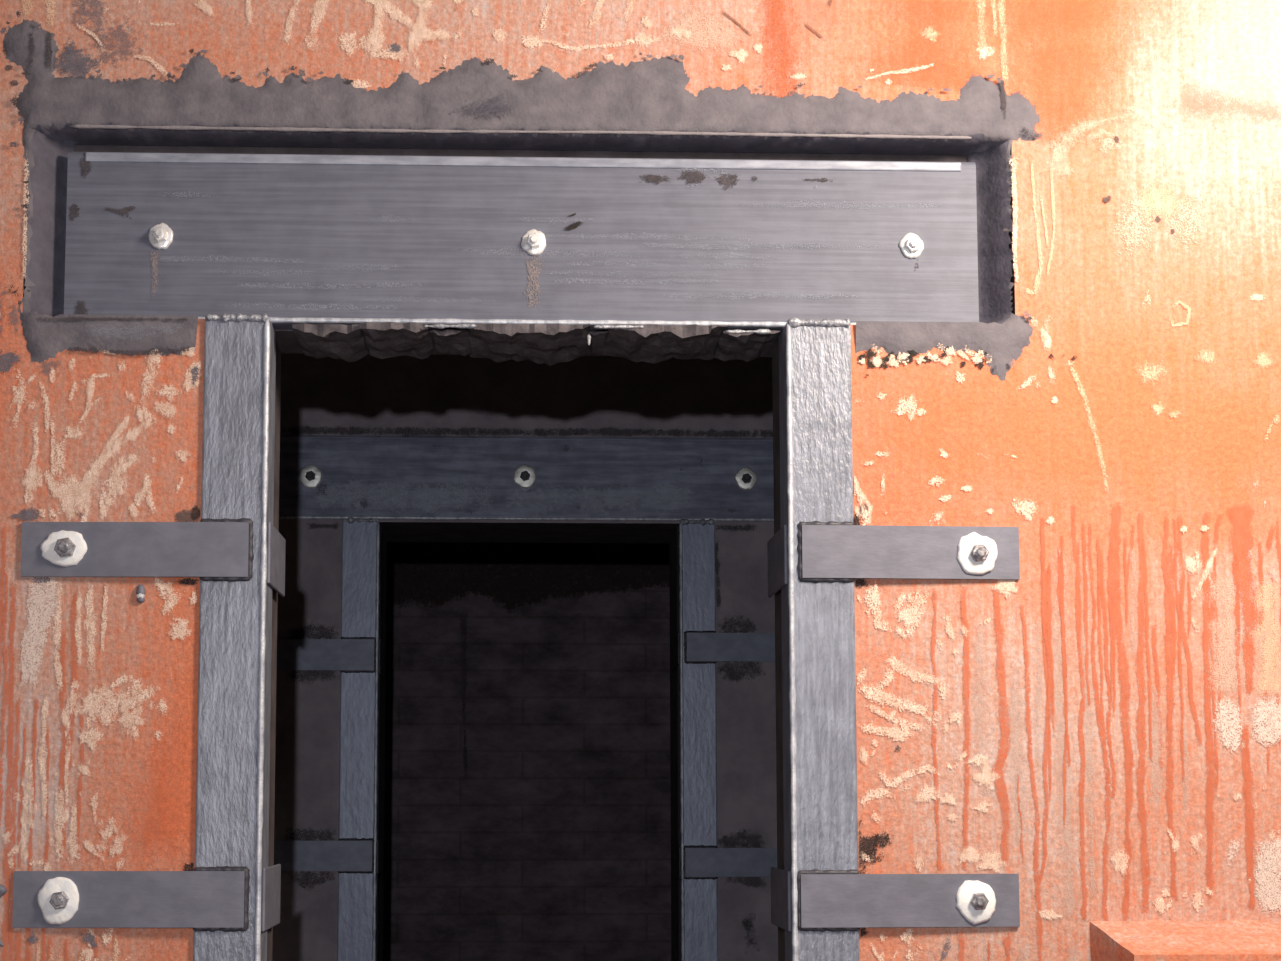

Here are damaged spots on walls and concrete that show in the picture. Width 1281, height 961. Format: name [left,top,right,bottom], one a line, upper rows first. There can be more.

peeling [639,4,763,71]
peeling [638,168,757,190]
peeling [22,159,30,277]
spalling [292,322,780,366]
flaking render [858,343,992,382]
peeling [27,358,96,425]
peeling [856,392,927,421]
peeling [128,480,152,521]
peeling [928,476,974,526]
peeling [152,577,197,641]
peeling [1,577,168,871]
peeling [77,928,131,961]